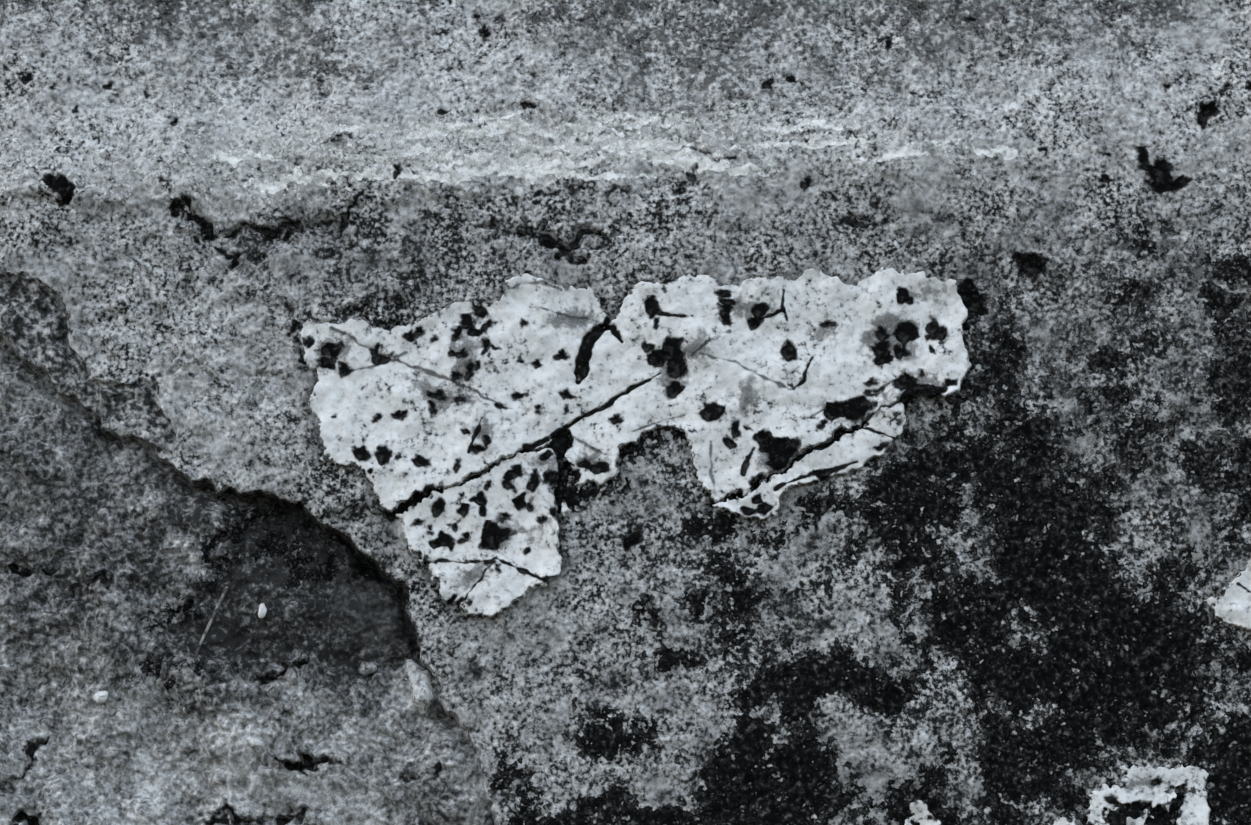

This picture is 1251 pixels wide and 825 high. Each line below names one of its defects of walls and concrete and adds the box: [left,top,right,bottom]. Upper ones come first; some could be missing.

crack [283,137,750,532]
crack [657,311,813,390]
water stain [960,286,1040,421]
water stain [1064,212,1251,440]
water stain [554,428,689,528]
peeling [299,266,987,619]
crack [708,381,915,508]
crack [420,557,546,606]
crack [4,736,60,825]
crack [273,753,342,775]
water stain [490,745,548,825]
water stain [1128,778,1153,792]